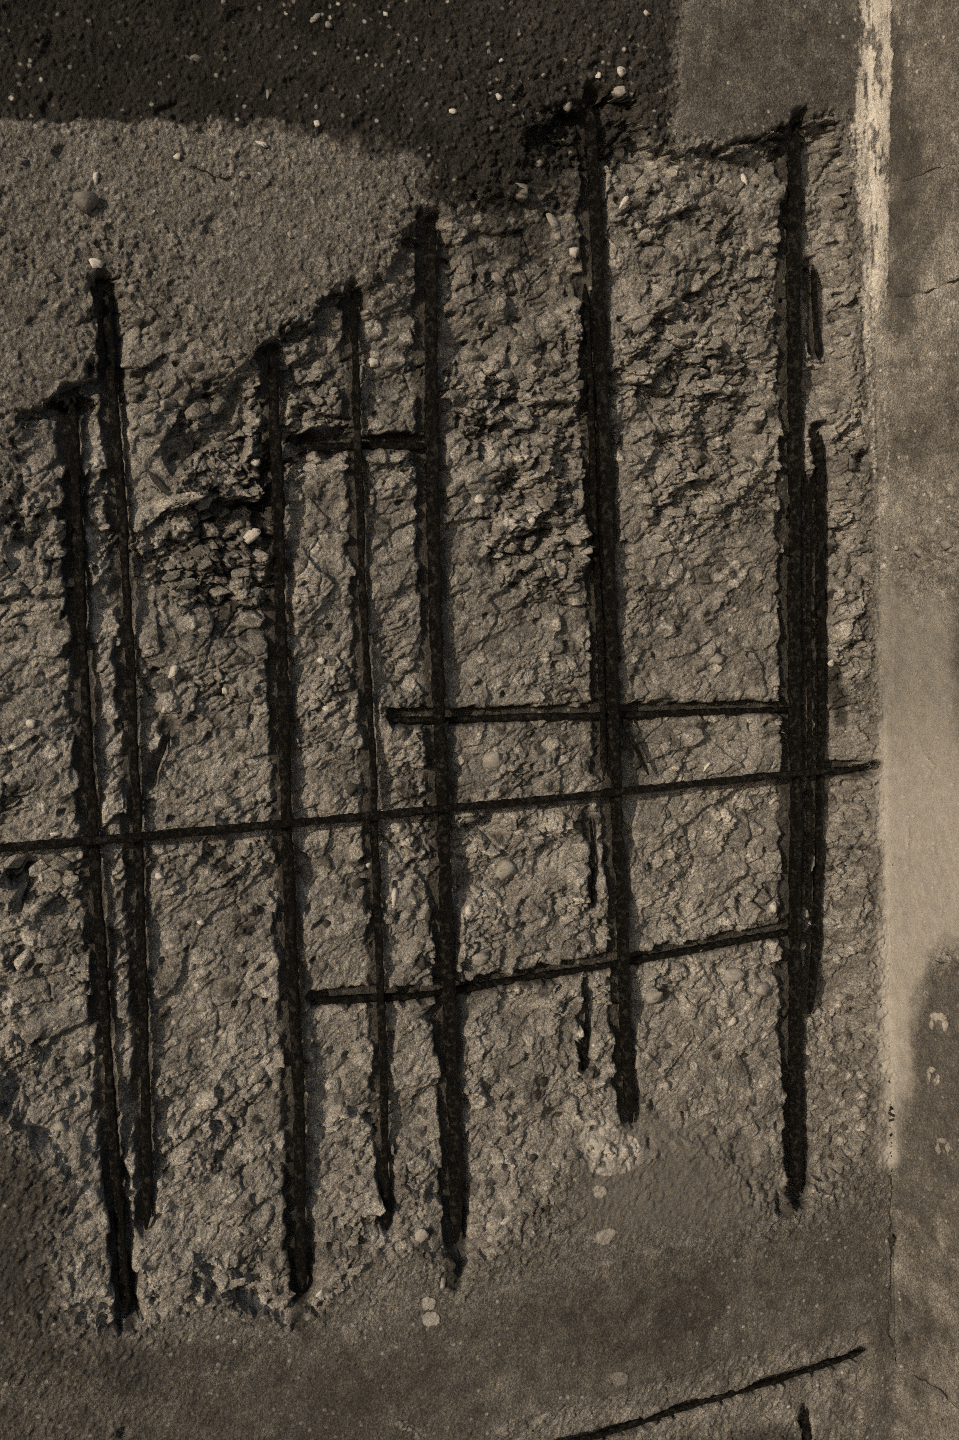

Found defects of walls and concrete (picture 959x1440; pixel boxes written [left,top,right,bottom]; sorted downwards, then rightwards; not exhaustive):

spalling [0,89,882,1338]
crack [892,278,959,299]